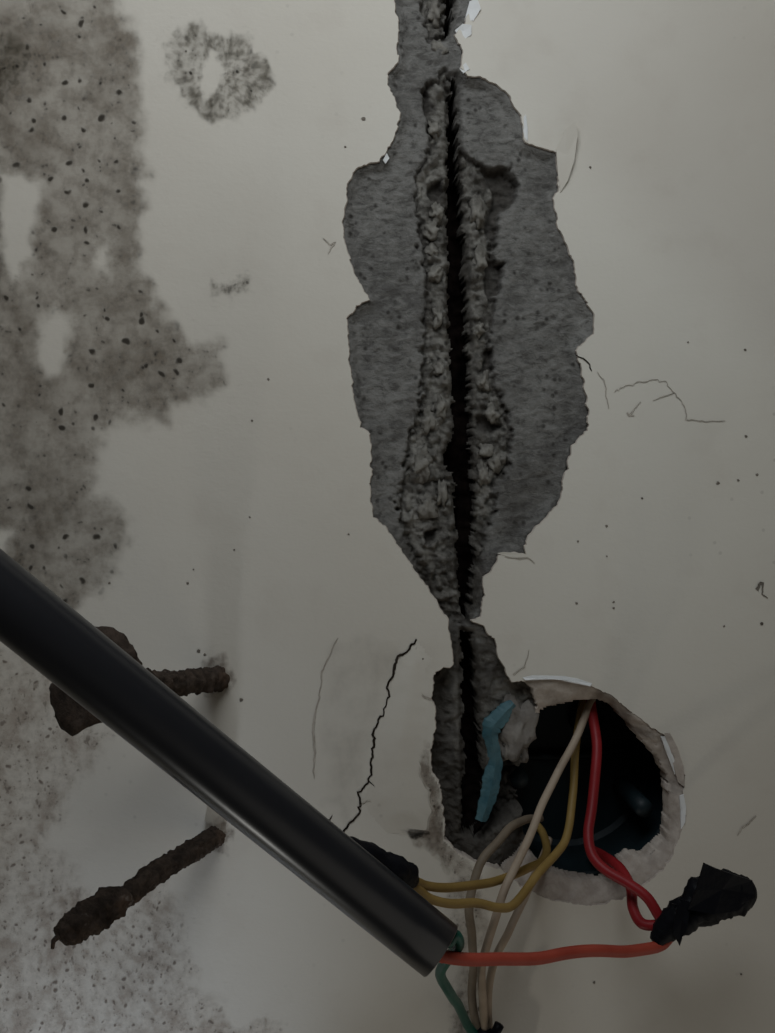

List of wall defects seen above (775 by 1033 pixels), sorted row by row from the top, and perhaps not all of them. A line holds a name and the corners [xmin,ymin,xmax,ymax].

damp [0,0,135,195]
damp [178,25,270,121]
crack [443,0,451,39]
damp [71,202,103,256]
damp [0,289,90,604]
damp [70,282,201,430]
crack [443,92,483,834]
spalling [343,0,686,905]
crack [329,639,417,832]